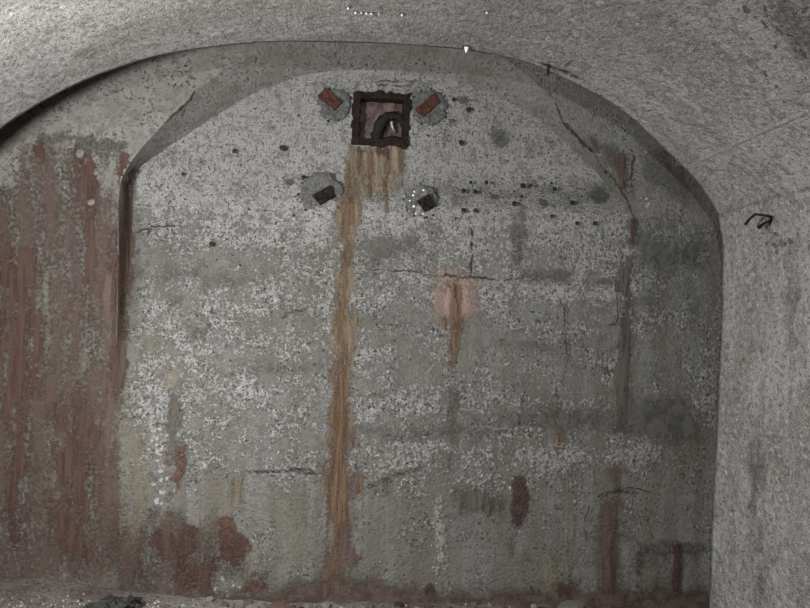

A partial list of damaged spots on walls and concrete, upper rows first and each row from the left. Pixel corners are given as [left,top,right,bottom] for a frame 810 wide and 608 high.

corrosion [0,139,709,608]